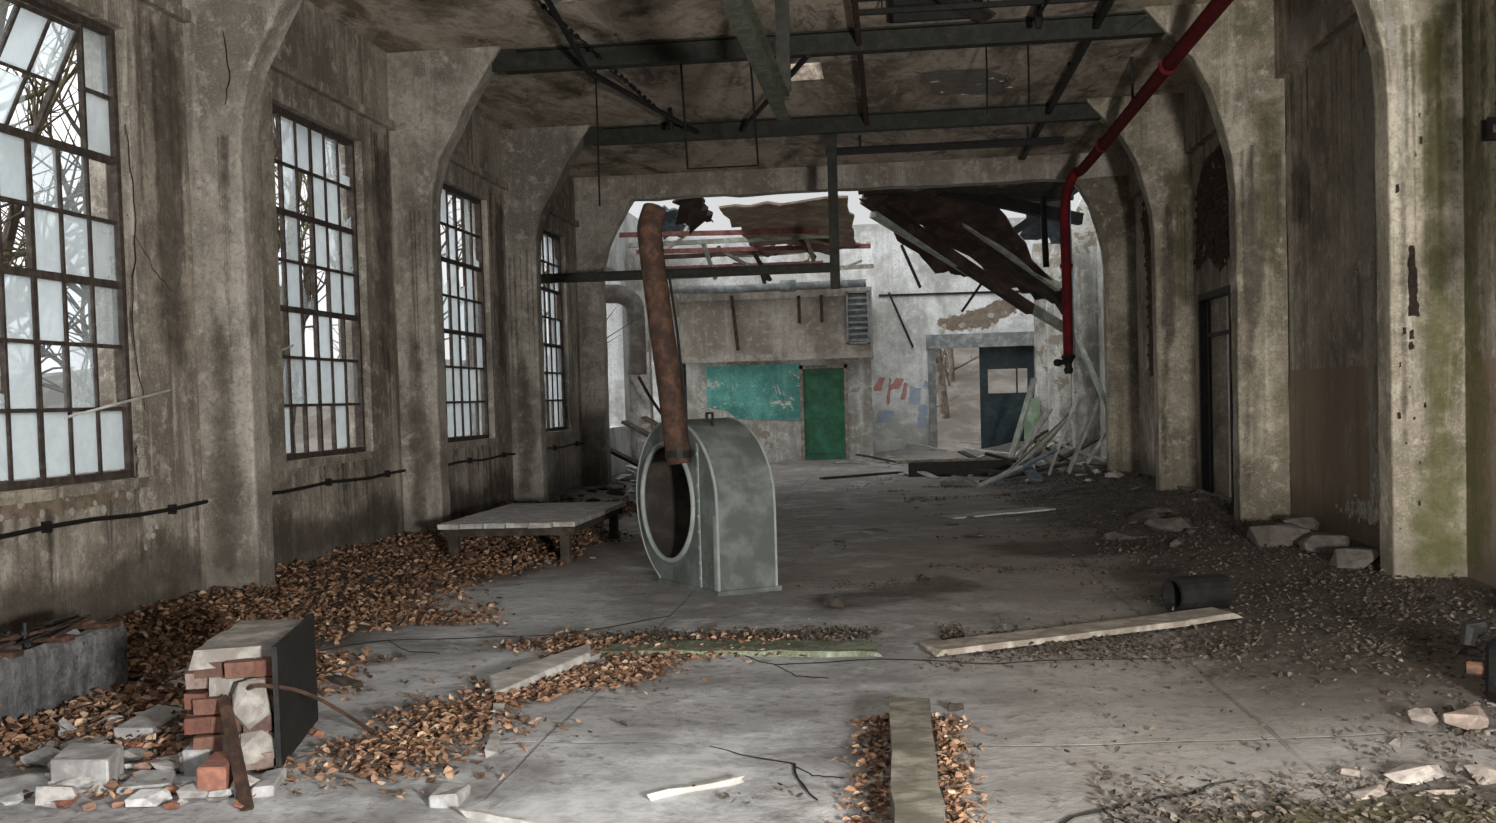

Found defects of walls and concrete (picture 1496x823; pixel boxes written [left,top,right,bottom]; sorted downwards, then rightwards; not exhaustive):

flaking render [1141,196,1154,377]
flaking render [1194,144,1230,271]
damp [1462,0,1496,297]
peeling [1335,441,1380,526]